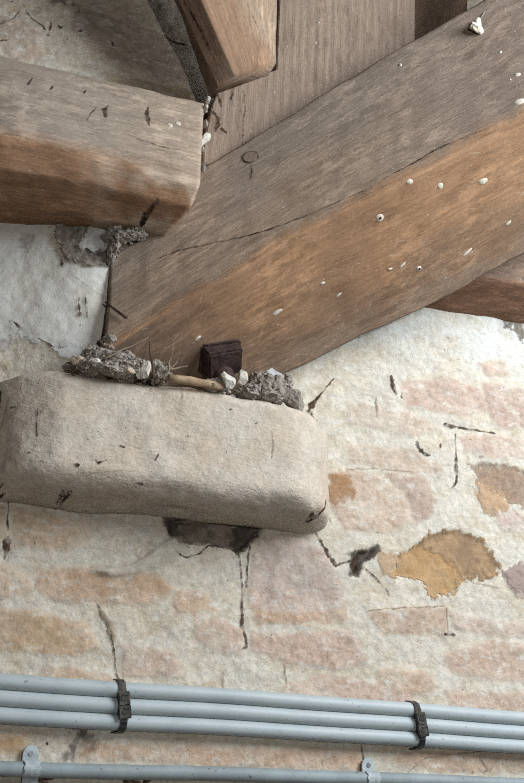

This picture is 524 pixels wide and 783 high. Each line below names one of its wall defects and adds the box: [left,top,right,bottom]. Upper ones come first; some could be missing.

crack [0,1,52,41]
flaking render [0,223,109,359]
crack [307,378,335,418]
crack [375,375,403,411]
crack [416,422,496,488]
crack [170,521,261,649]
crack [306,503,449,629]